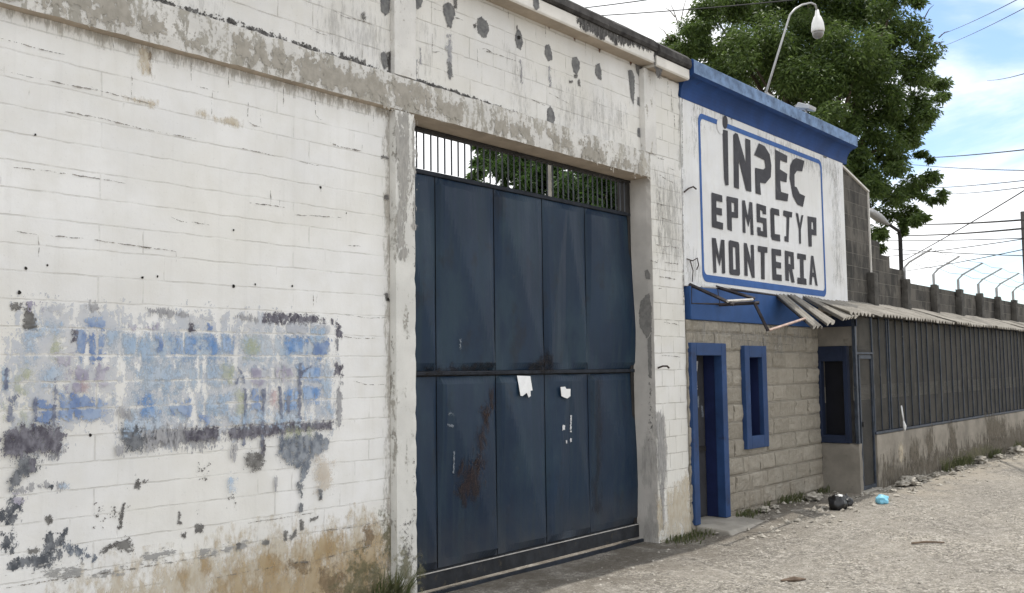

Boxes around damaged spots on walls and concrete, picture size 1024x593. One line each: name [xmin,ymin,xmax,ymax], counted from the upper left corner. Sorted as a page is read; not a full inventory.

peeling [3,0,173,38]
spalling [380,0,390,15]
spalling [443,0,457,80]
spalling [473,16,489,38]
spalling [515,25,523,84]
spalling [569,57,581,87]
spalling [628,64,642,107]
peeling [230,32,464,262]
peeling [494,112,531,142]
peeling [546,106,651,181]
peeling [0,292,344,584]
water stain [648,382,692,536]